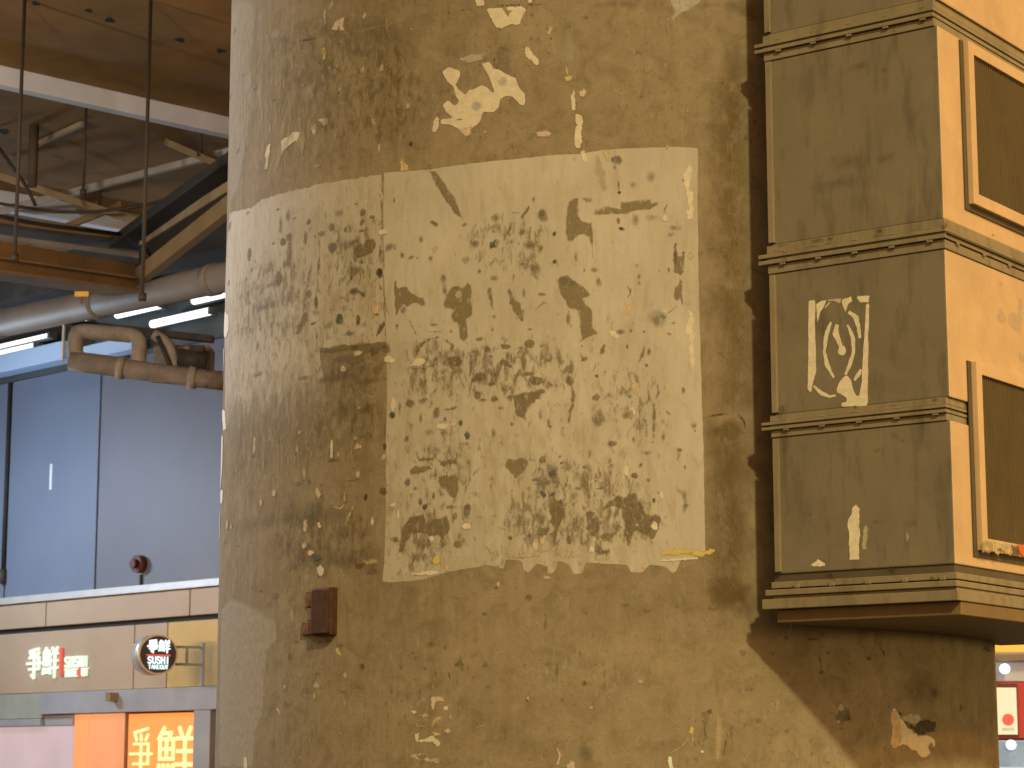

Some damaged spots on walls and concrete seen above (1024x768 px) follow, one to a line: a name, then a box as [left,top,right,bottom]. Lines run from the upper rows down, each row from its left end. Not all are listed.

peeling [432,53,525,136]
peeling [223,208,307,364]
peeling [320,313,395,382]
peeling [319,203,437,315]
peeling [430,171,466,225]
peeling [390,276,587,444]
peeling [559,276,597,340]
peeling [553,181,667,253]
peeling [654,243,695,368]
peeling [380,447,471,576]
peeling [506,451,663,559]
spalling [889,708,936,757]